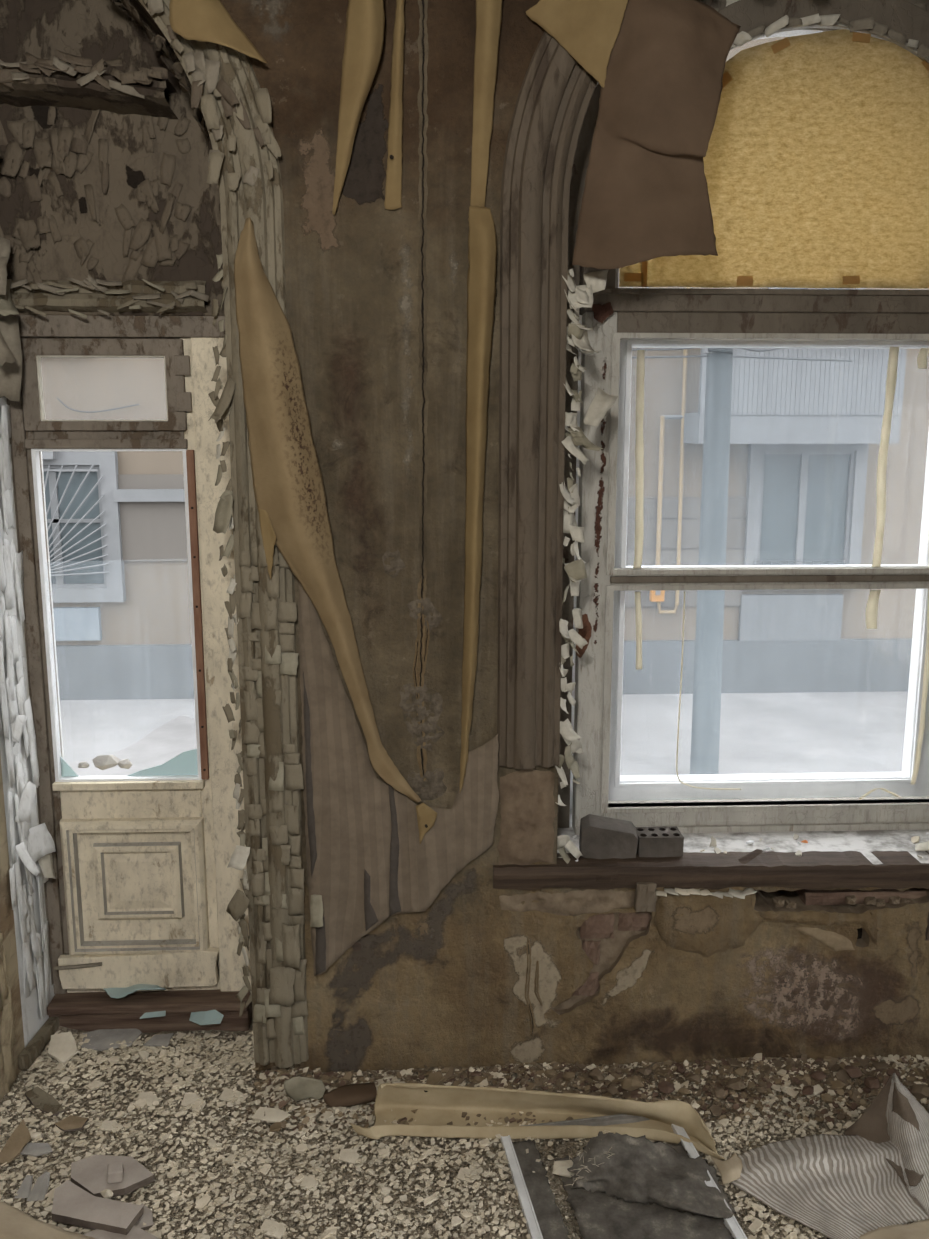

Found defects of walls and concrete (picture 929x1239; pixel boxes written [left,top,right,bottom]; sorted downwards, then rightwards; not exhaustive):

peeling [733,13,929,58]
peeling [298,84,389,252]
peeling [0,0,323,1092]
peeling [497,269,618,865]
flaking render [325,868,476,1072]
flaking render [504,935,562,1064]
flaking render [499,889,635,916]
flaking render [602,949,654,1005]
water stain [595,952,918,1061]
flaking render [794,927,862,952]
spalling [772,888,927,909]
flaking render [873,996,920,1025]